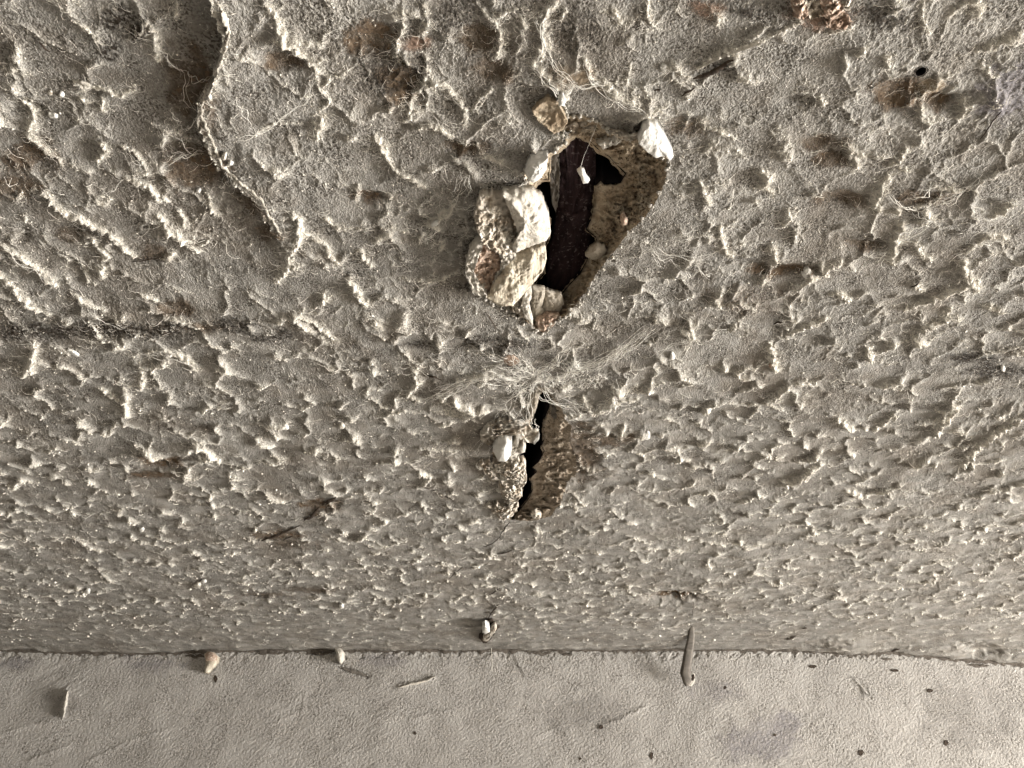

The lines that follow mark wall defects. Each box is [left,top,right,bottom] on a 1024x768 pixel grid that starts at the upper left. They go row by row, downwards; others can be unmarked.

spalling [462,92,673,336]
spalling [479,385,578,522]